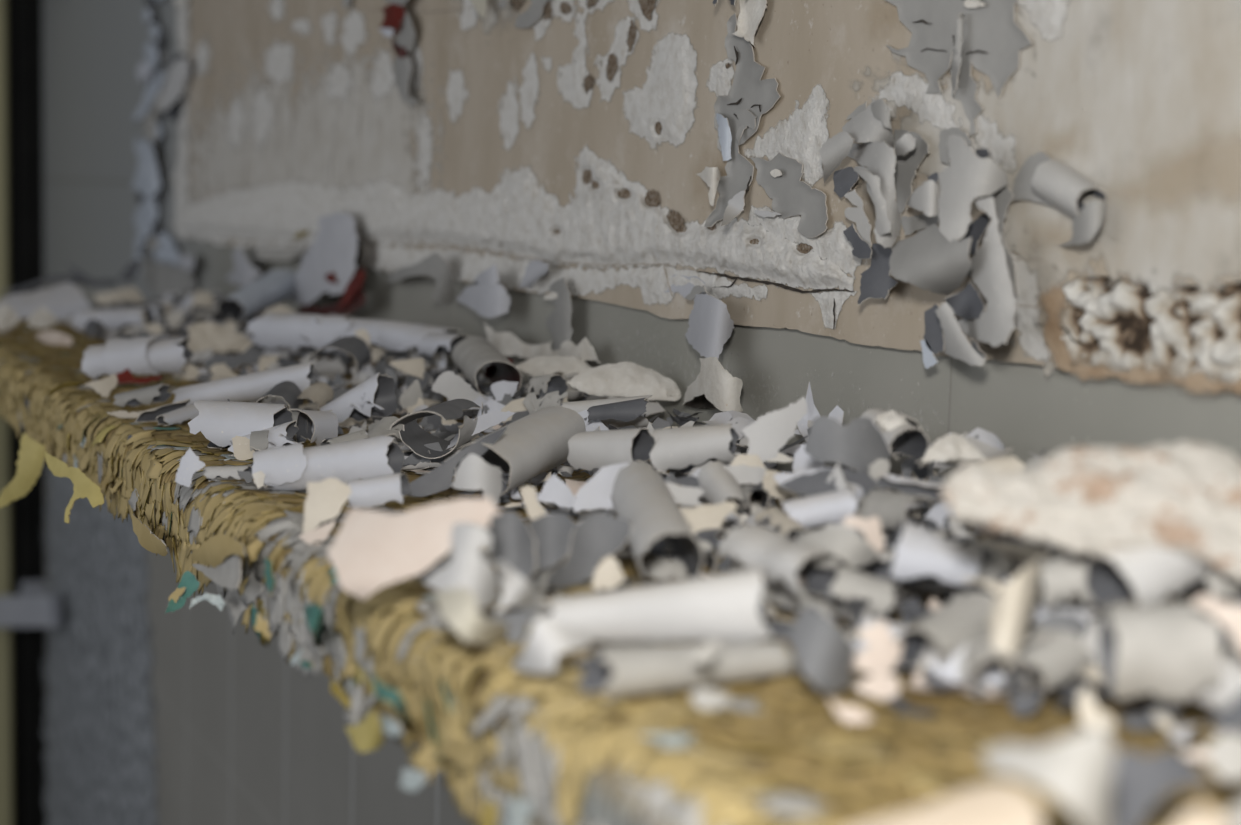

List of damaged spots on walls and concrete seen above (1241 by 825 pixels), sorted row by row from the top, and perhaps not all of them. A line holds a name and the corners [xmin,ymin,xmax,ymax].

peeling [0,0,211,305]
peeling [165,292,214,329]
peeling [262,0,434,192]
flaking render [445,69,469,123]
flaking render [458,0,508,30]
flaking render [205,213,768,351]
peeling [497,0,1241,394]
water stain [853,0,1241,345]
peeling [0,318,1241,825]